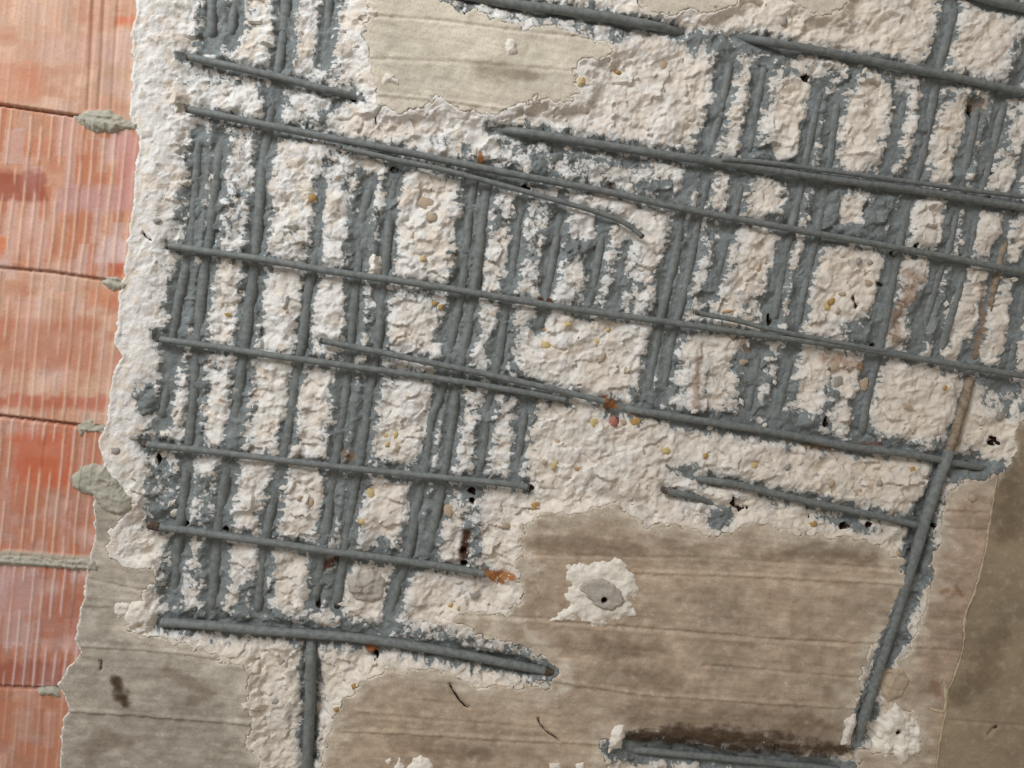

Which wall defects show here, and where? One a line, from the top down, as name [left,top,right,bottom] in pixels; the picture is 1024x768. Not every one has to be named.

spalling [185,53,357,101]
spalling [274,0,292,73]
spalling [439,0,736,65]
spalling [737,34,1024,97]
spalling [185,91,1024,374]
spalling [156,242,1024,475]
spalling [141,441,530,558]
rust [480,569,515,584]
spalling [599,377,975,768]
spalling [160,617,554,676]
spalling [312,648,359,768]
water stain [626,724,853,757]